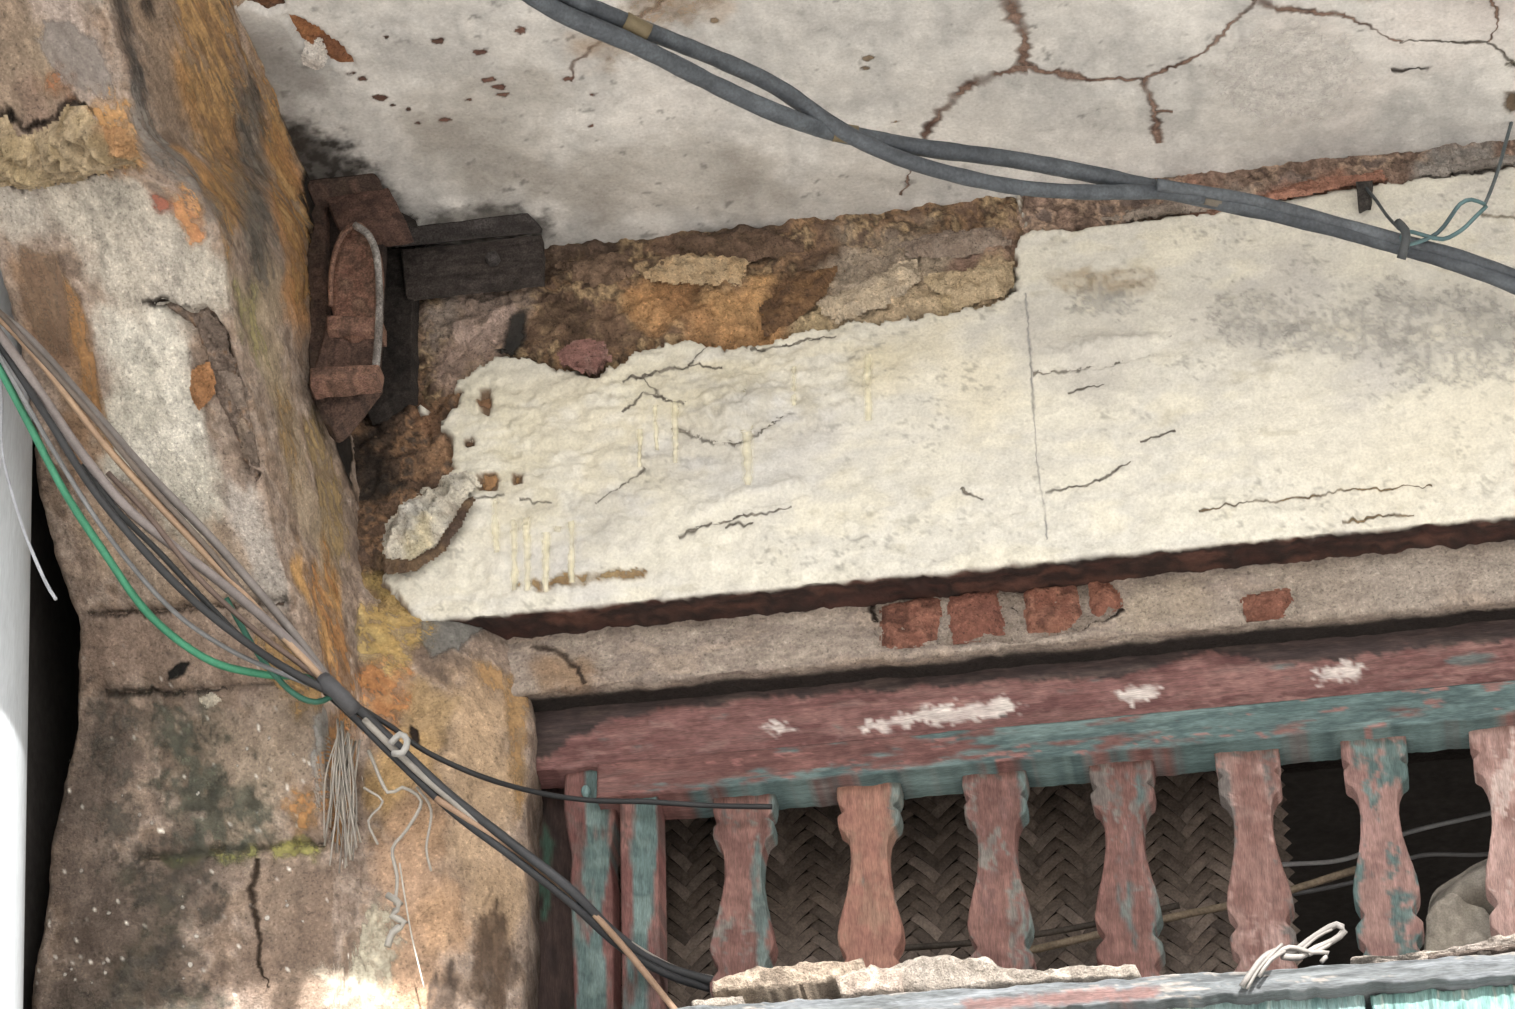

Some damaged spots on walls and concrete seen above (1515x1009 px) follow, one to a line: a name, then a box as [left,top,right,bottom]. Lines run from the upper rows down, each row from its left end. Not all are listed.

spalling [247,0,420,124]
spalling [482,77,509,97]
crack [899,0,1515,196]
corrosion [1505,92,1515,112]
spalling [1153,139,1515,201]
crack [621,336,836,446]
spalling [351,196,1221,616]
crack [1025,293,1123,395]
crack [678,506,792,539]
crack [1046,430,1176,538]
spalling [874,581,1124,652]
crack [142,838,324,988]